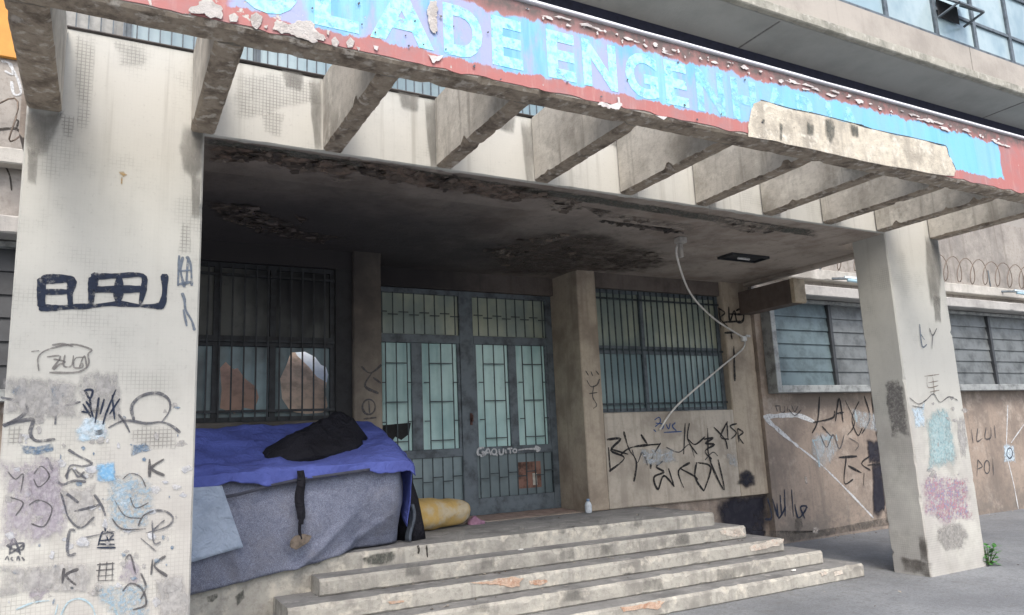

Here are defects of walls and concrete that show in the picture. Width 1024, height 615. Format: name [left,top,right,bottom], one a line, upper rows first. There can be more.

peeling [188,0,360,51]
peeling [414,0,442,34]
peeling [542,16,686,63]
peeling [598,96,622,110]
peeling [699,57,1010,147]
flaking render [748,101,956,176]
damp [186,132,397,213]
damp [414,105,813,237]
peeling [209,146,689,274]
spalling [470,576,548,588]
spalling [620,601,665,612]